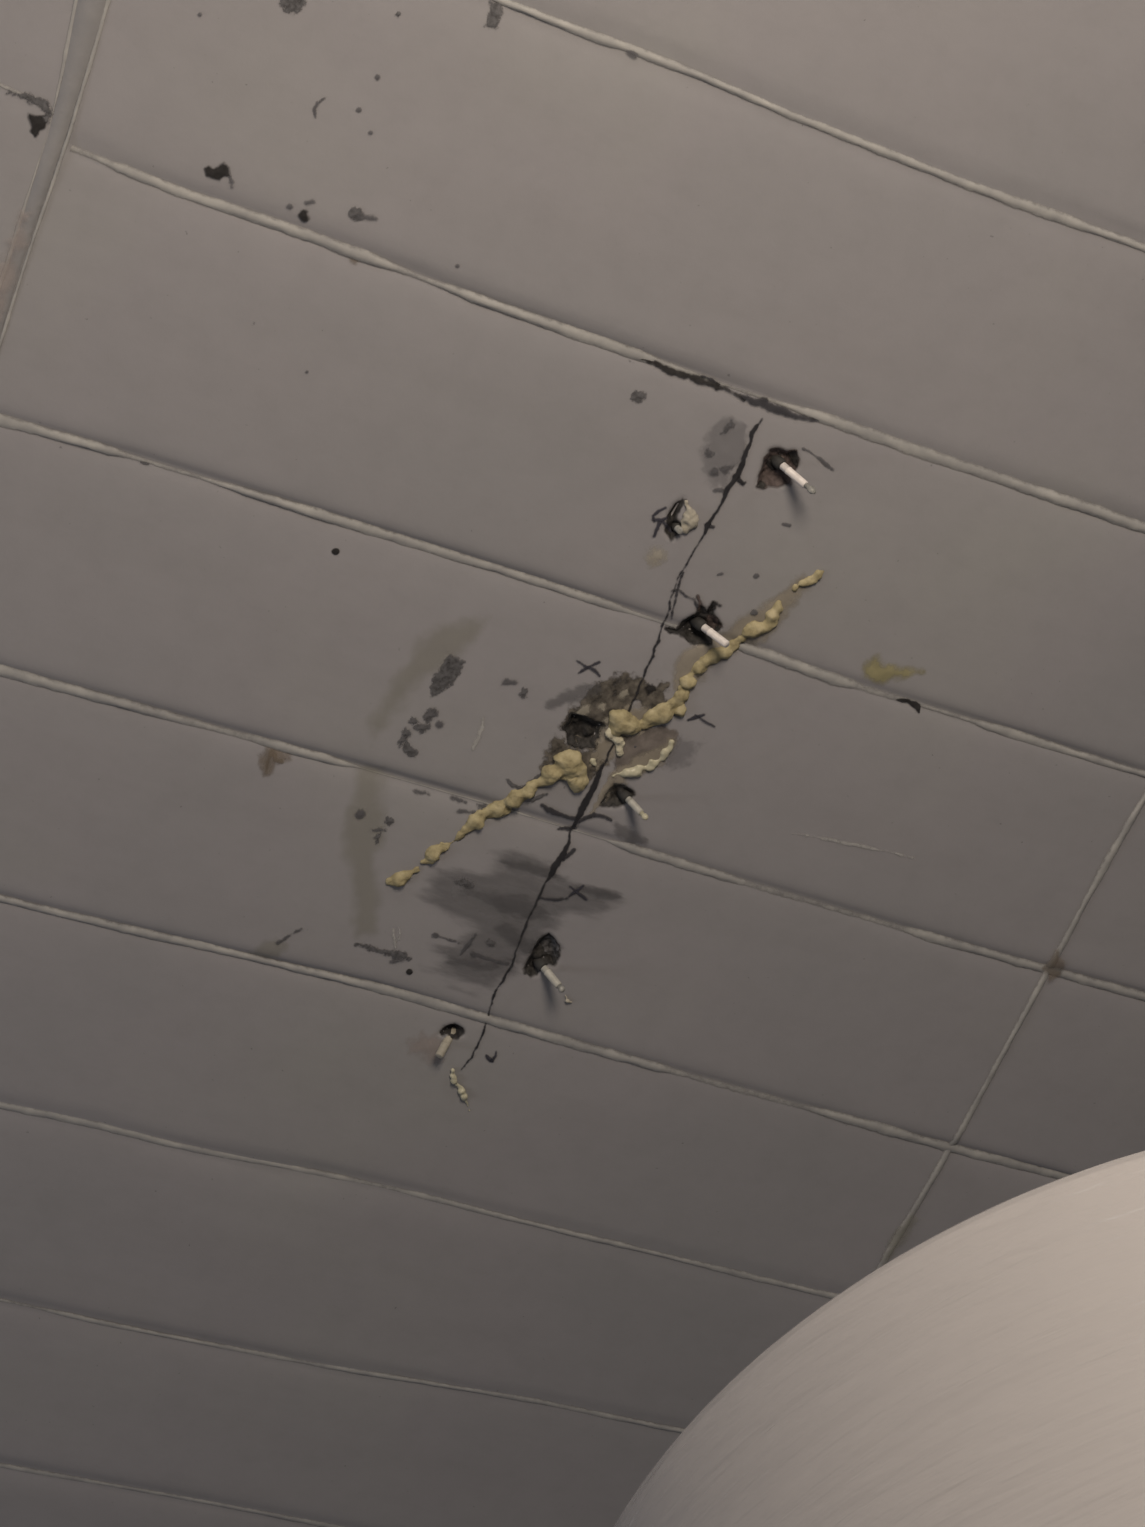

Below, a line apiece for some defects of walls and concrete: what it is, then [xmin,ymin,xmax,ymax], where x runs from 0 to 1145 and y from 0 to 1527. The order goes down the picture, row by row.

crack [461,359,834,1070]